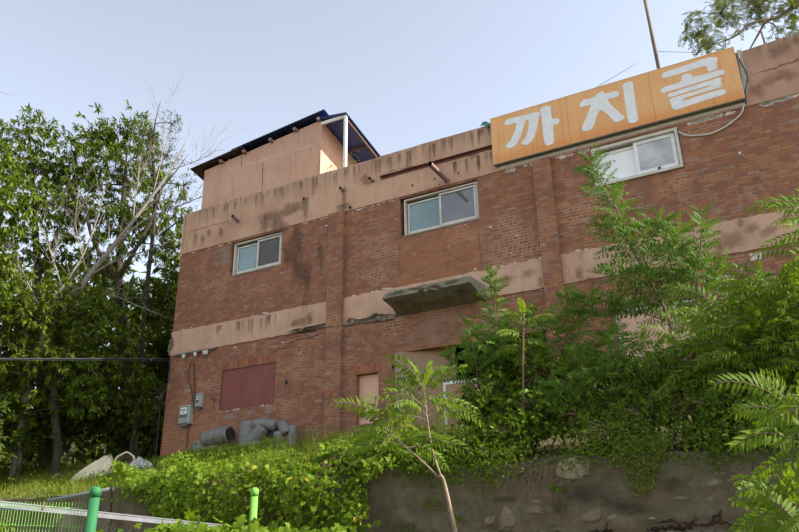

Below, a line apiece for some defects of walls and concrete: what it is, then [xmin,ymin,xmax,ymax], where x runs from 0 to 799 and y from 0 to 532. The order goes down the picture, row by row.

spalling [344,313,396,326]
spalling [288,323,326,333]